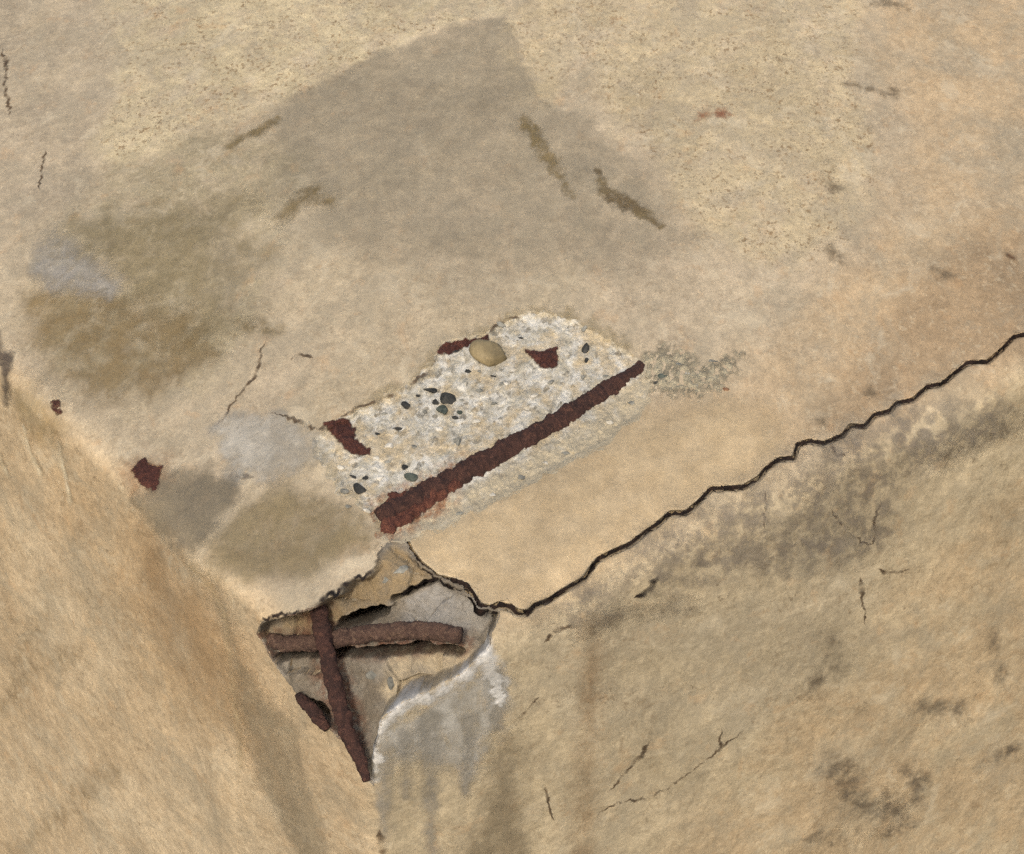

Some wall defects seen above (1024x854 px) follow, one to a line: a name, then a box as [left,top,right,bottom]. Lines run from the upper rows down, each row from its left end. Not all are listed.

water stain [228,20,664,238]
water stain [28,210,216,390]
corrosion [50,399,62,416]
corrosion [131,457,163,493]
crack [209,346,264,433]
corrosion [323,418,370,455]
crack [263,332,1024,624]
water stain [215,491,368,579]
spalling [210,308,742,786]
corrosion [295,692,331,732]
water stain [372,638,509,818]